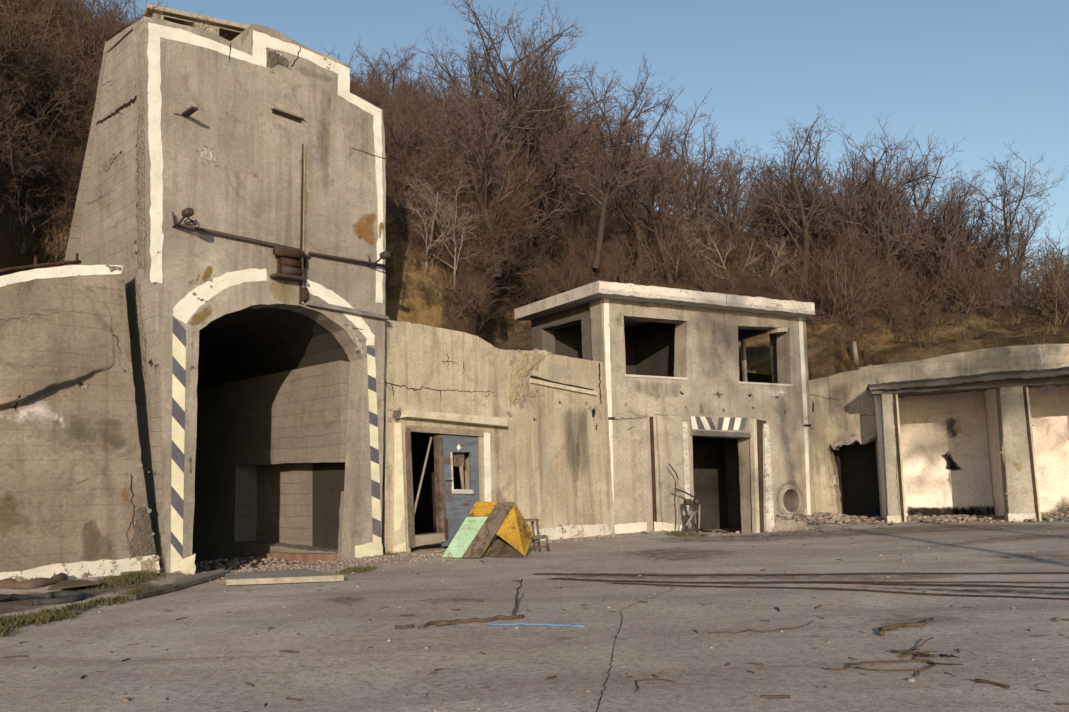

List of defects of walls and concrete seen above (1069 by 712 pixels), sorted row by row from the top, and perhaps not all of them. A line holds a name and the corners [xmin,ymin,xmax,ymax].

rust [356,214,384,243]
rust [191,308,211,325]
spalling [507,349,552,417]